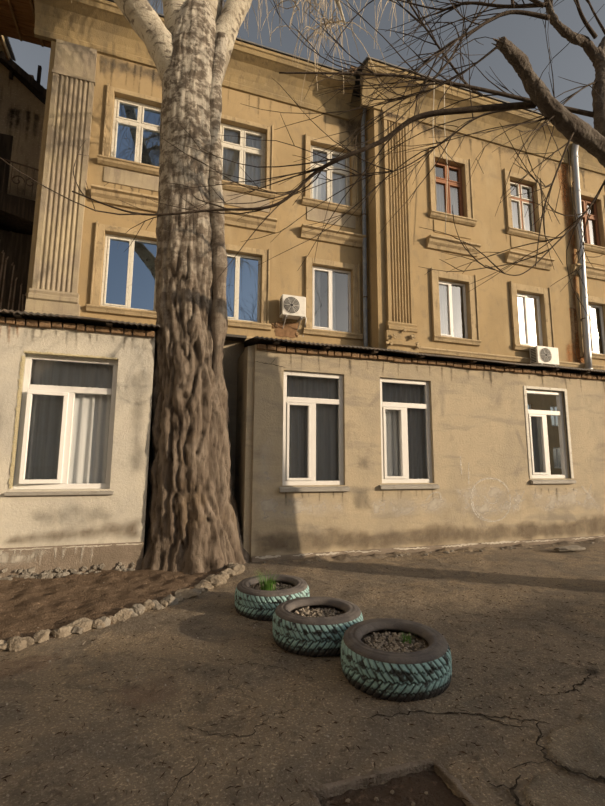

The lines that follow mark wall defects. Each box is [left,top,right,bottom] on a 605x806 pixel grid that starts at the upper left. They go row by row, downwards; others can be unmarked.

corrosion [558,163,575,264]
corrosion [567,275,583,362]
damp [338,528,478,547]
damp [491,518,605,539]